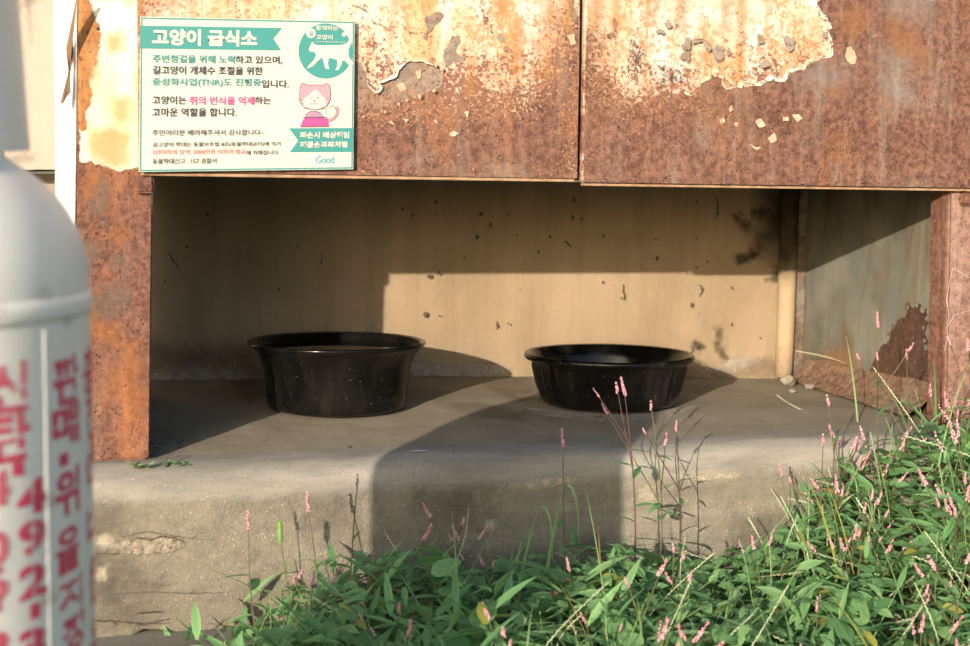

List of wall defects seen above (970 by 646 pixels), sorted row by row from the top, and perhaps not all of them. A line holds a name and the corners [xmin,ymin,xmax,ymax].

spalling [114,537,185,555]